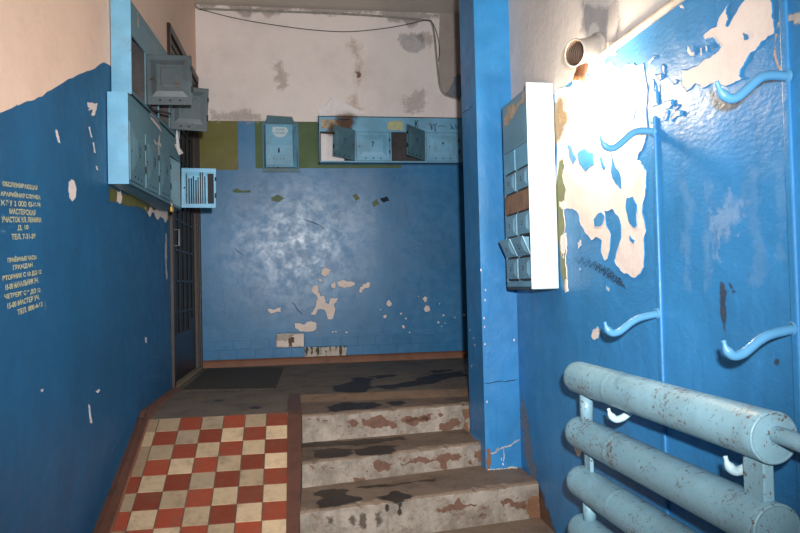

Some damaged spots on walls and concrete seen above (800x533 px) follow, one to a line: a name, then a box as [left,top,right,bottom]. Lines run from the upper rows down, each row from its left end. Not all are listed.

peeling [87,102,98,116]
peeling [554,0,776,293]
peeling [68,179,77,202]
peeling [276,267,371,357]
damp [327,369,468,412]
peeling [339,409,470,433]
crack [491,439,520,462]
damp [314,479,435,529]
peeling [435,498,494,519]
peeling [500,495,540,519]